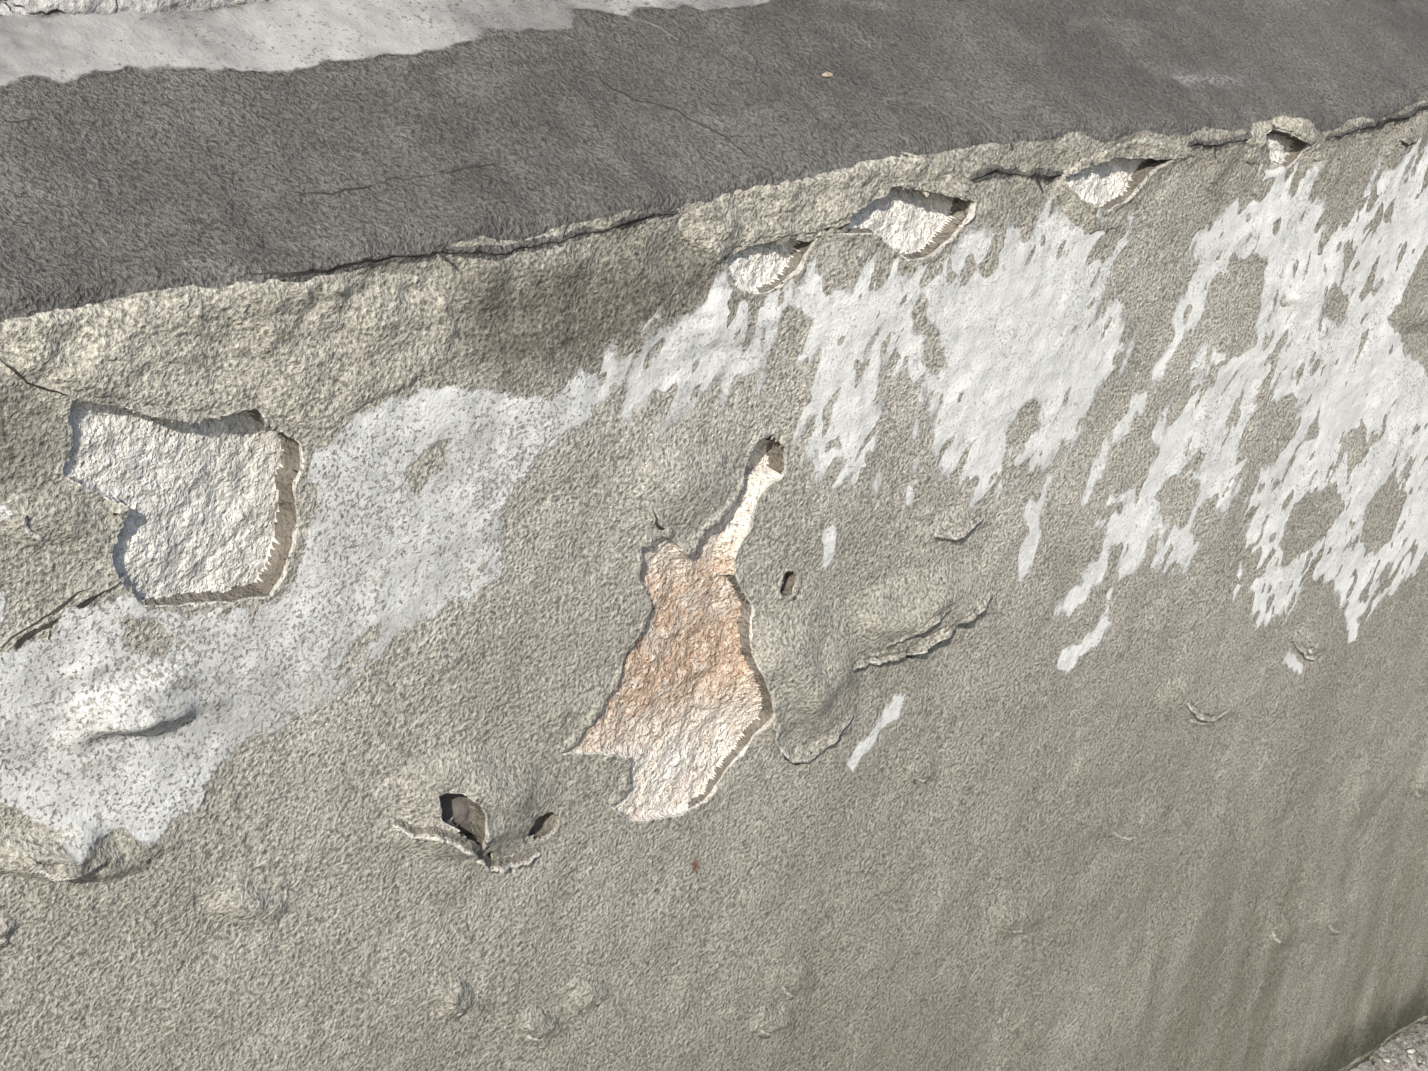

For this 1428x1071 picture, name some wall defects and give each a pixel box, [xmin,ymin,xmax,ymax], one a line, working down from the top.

water stain [1167,68,1249,90]
crack [1187,129,1252,158]
crack [1325,102,1428,151]
crack [293,161,506,199]
crack [900,152,931,197]
crack [970,164,1063,193]
crack [244,207,678,283]
crack [776,220,850,245]
crack [0,356,70,400]
peeling [1054,115,1428,674]
peeling [0,137,1196,865]
crack [652,508,668,538]